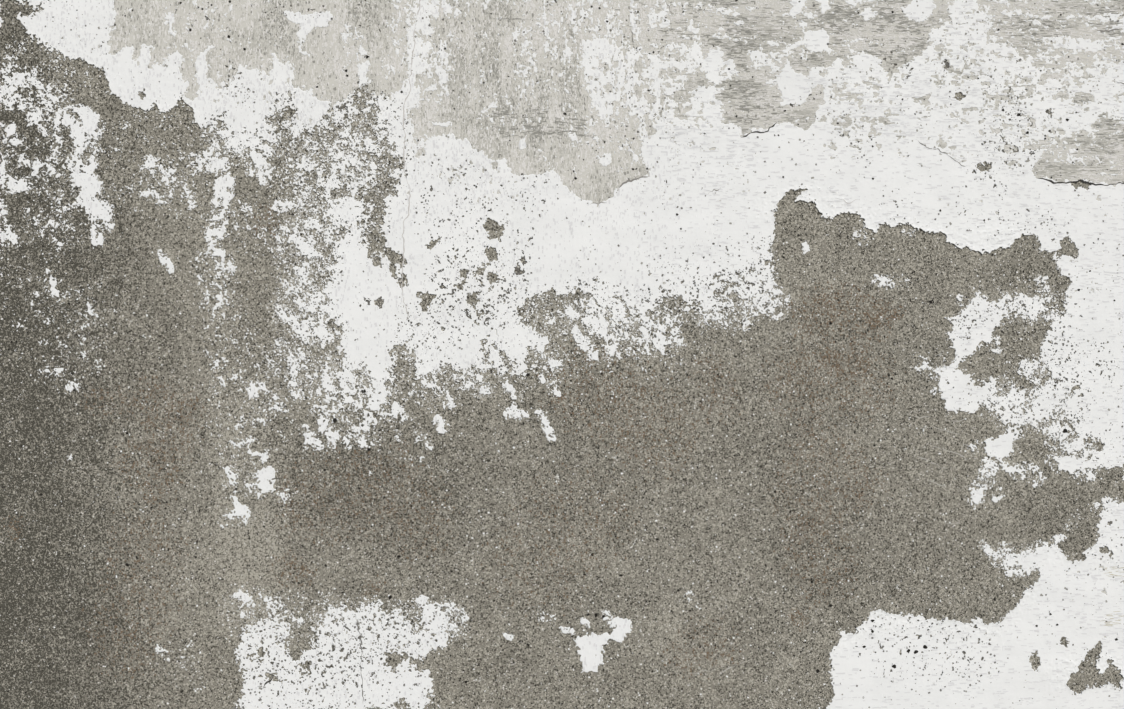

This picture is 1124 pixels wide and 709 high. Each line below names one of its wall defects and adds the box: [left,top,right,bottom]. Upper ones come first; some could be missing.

peeling [164,0,305,96]
peeling [335,16,369,78]
peeling [979,0,1124,72]
peeling [971,87,1123,190]
crack [1039,178,1124,186]
peeling [1029,624,1069,672]
peeling [1066,641,1123,695]